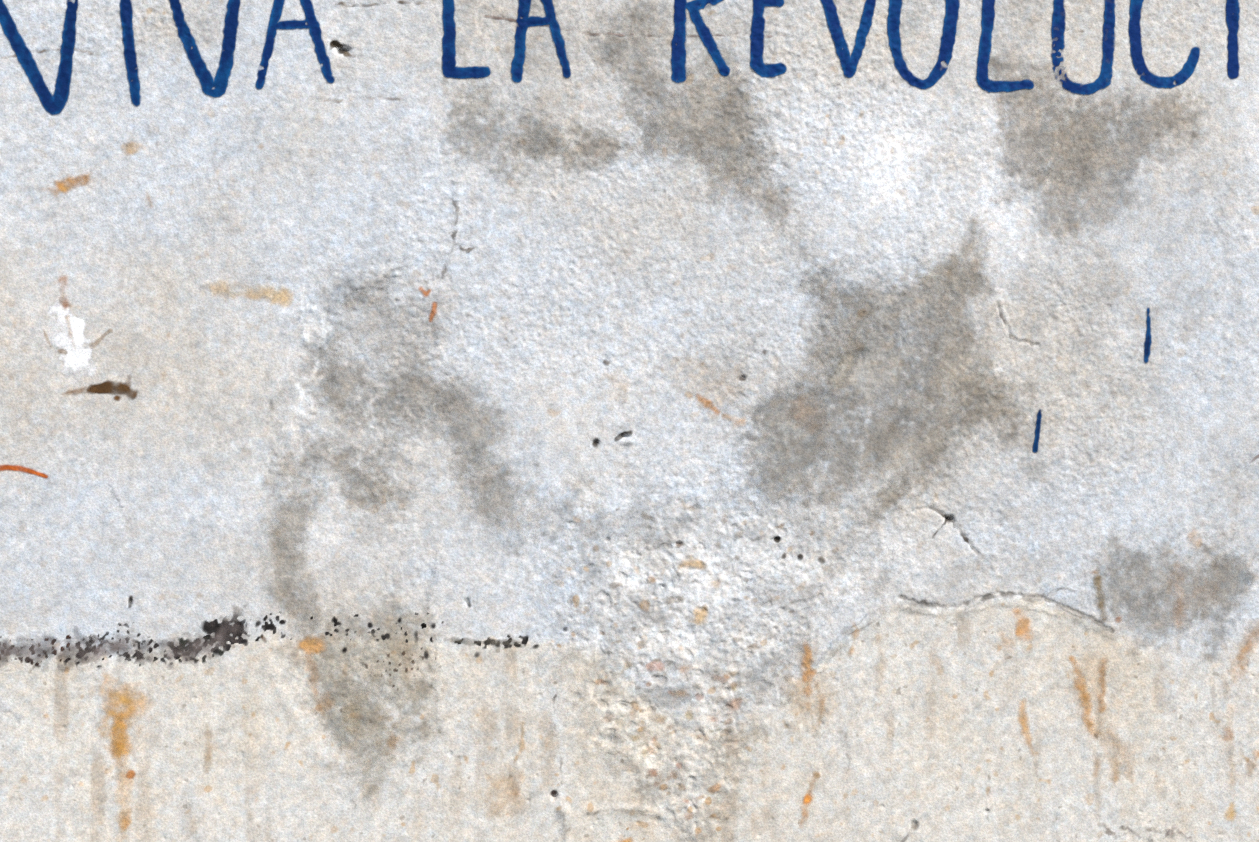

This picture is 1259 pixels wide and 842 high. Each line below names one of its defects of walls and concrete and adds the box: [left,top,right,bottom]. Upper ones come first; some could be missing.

leakage [651,77,785,213]
leakage [988,60,1198,236]
peeling [48,301,97,379]
leakage [319,352,523,521]
leakage [743,241,1018,518]
rust [108,692,135,757]
leakage [0,452,403,667]
leakage [311,613,443,755]
leakage [455,635,538,656]
crack [936,511,969,543]
crack [901,589,1113,632]
leakage [1095,538,1252,658]